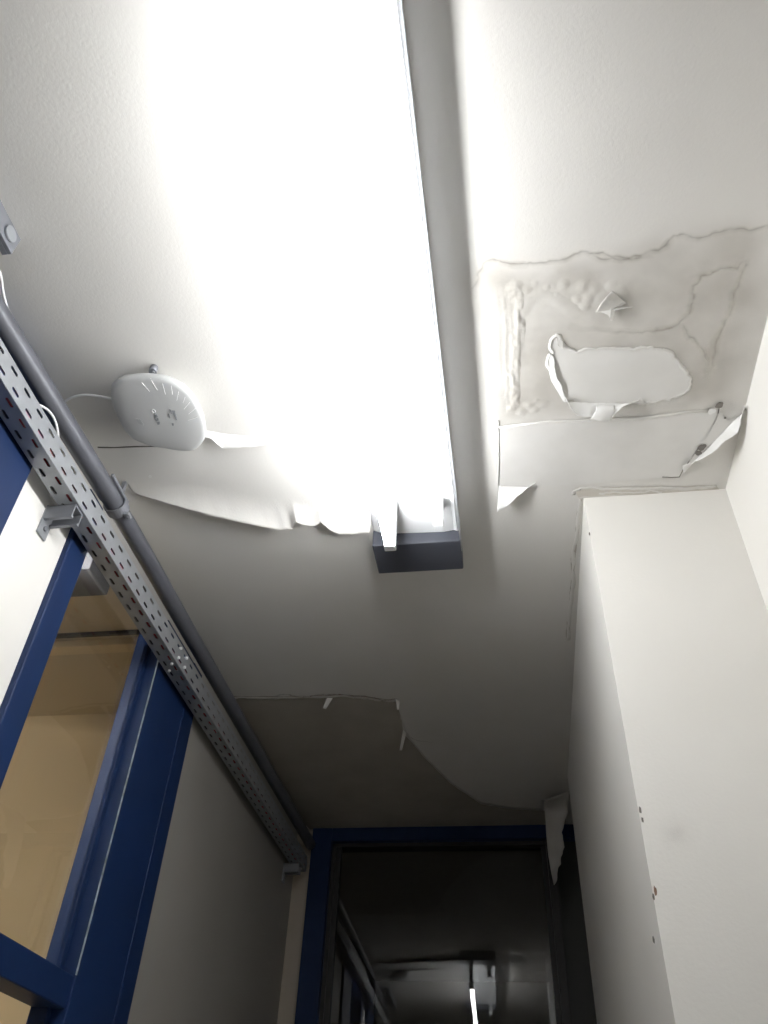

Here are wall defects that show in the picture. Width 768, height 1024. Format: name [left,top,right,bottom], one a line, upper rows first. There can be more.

peeling [545,333,692,422]
peeling [128,482,371,535]
flaking render [234,694,570,885]